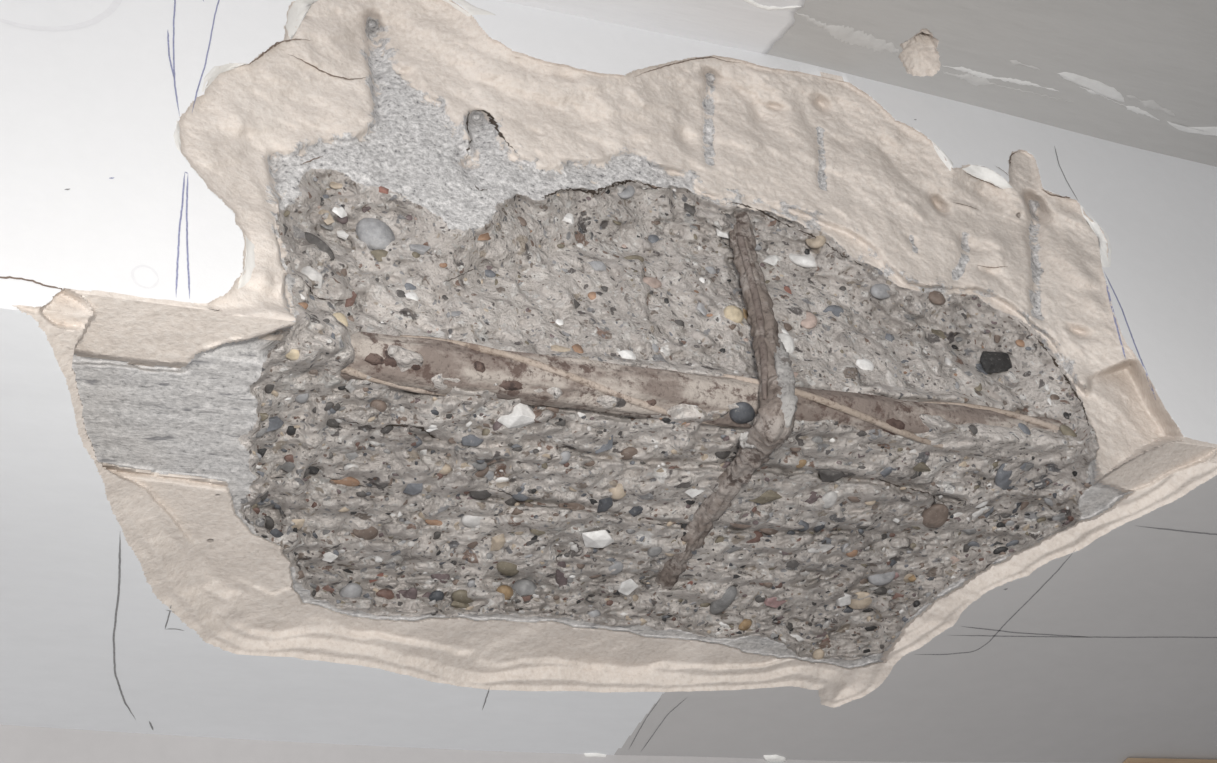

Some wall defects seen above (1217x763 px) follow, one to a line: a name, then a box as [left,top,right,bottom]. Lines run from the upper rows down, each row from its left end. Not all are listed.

peeling [285,0,318,39]
peeling [502,0,805,54]
peeling [1057,72,1124,102]
peeling [962,165,1013,189]
peeling [1080,205,1112,268]
peeling [238,235,255,289]
spalling [387,345,424,372]
spalling [422,589,447,606]
spalling [430,574,450,583]
spalling [451,600,474,610]
spalling [869,587,893,595]
spalling [812,632,831,648]